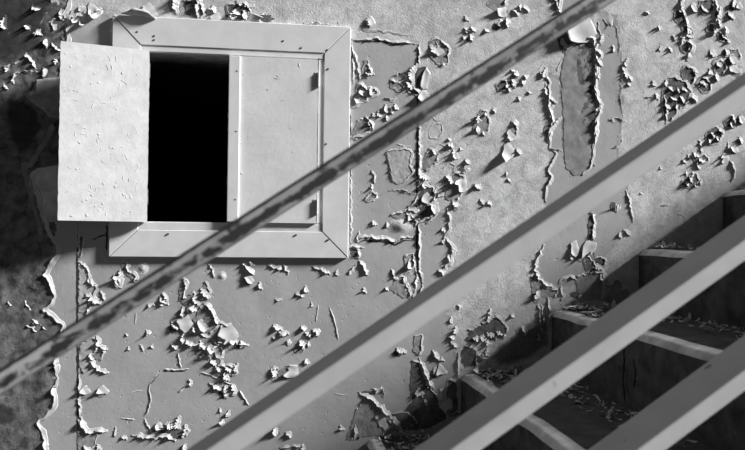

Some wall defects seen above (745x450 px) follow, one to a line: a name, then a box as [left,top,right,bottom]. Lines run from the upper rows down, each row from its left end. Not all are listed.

flaking render [0,0,103,369]
peeling [349,41,431,141]
peeling [386,118,492,276]
flaking render [495,15,633,202]
flaking render [644,0,743,124]
peeling [680,114,745,189]
flaking render [0,358,60,450]
peeling [77,415,191,450]
peeling [169,264,249,405]
peeling [268,324,321,380]
flaking render [339,308,526,440]
peeling [530,211,631,341]